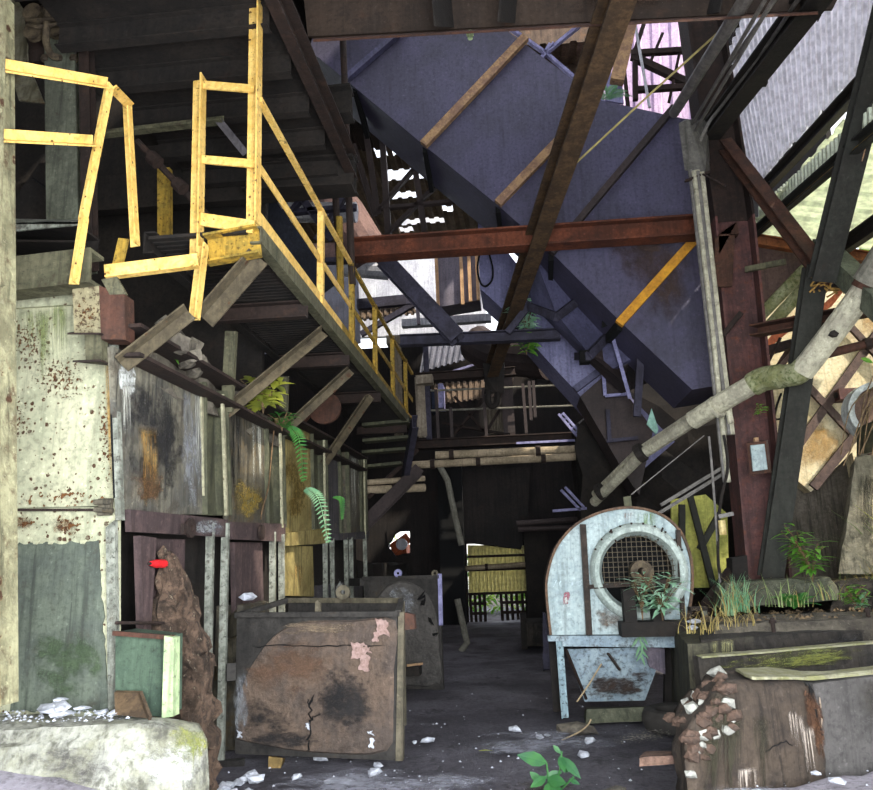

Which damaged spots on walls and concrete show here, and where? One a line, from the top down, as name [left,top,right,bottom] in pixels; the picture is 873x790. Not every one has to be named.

rust [16,317,89,400]
water stain [119,365,136,426]
rust [19,366,111,537]
rust [140,431,160,499]
water stain [159,395,202,504]